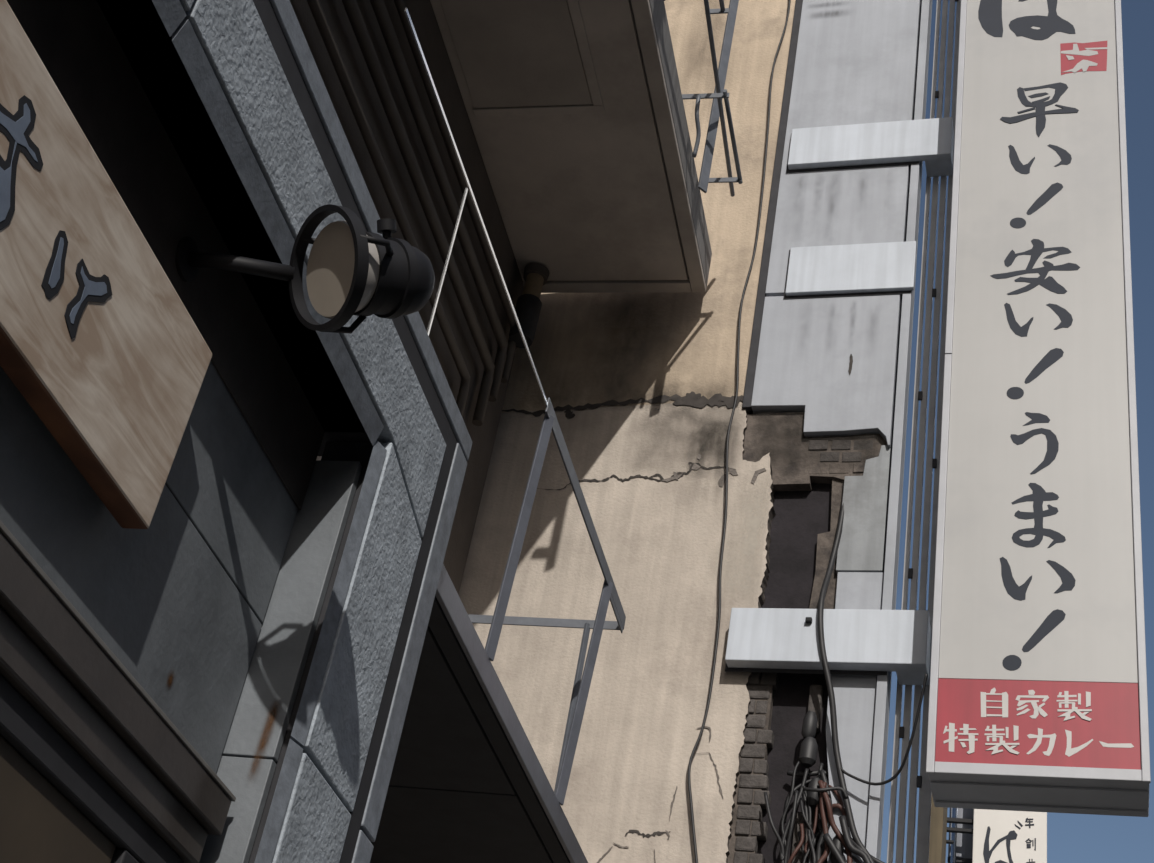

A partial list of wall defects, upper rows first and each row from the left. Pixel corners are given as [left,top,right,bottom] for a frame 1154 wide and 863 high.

crack [502,391,744,419]
crack [537,462,736,490]
spalling [661,454,701,482]
spalling [718,412,892,609]
spalling [808,685,823,732]
spalling [727,672,779,863]
spalling [791,812,808,863]